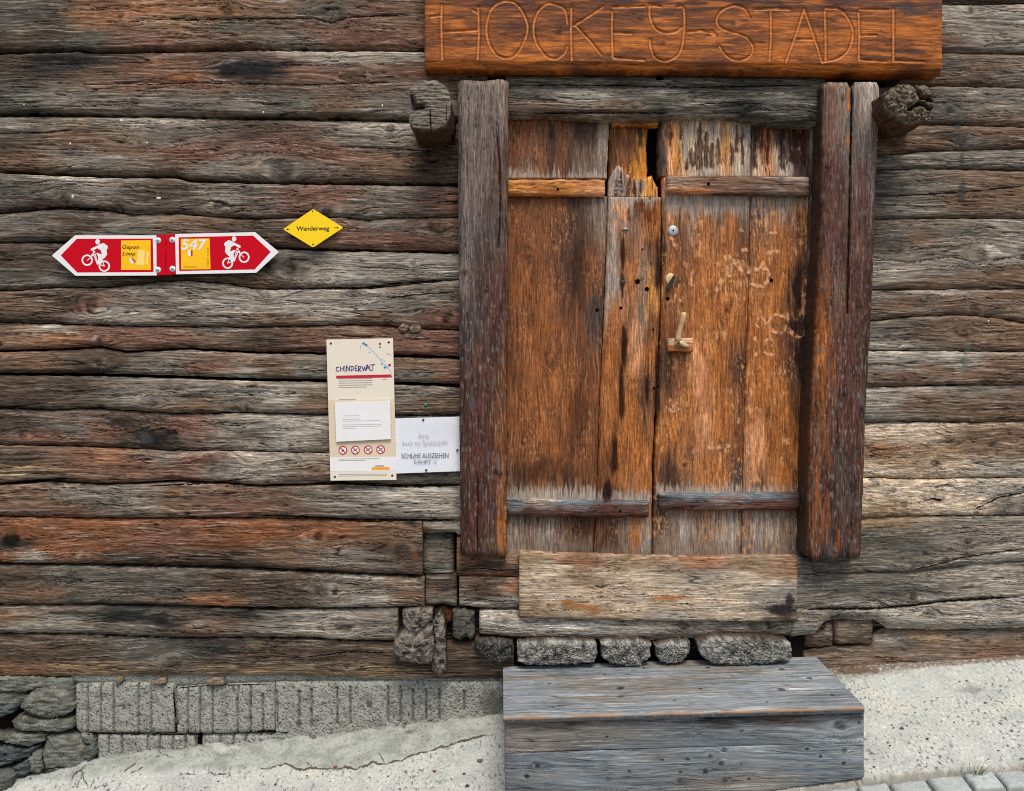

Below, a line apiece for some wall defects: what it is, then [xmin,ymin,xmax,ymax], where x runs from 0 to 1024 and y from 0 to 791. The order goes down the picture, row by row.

crack [975,492,1024,509]
crack [261,733,643,771]